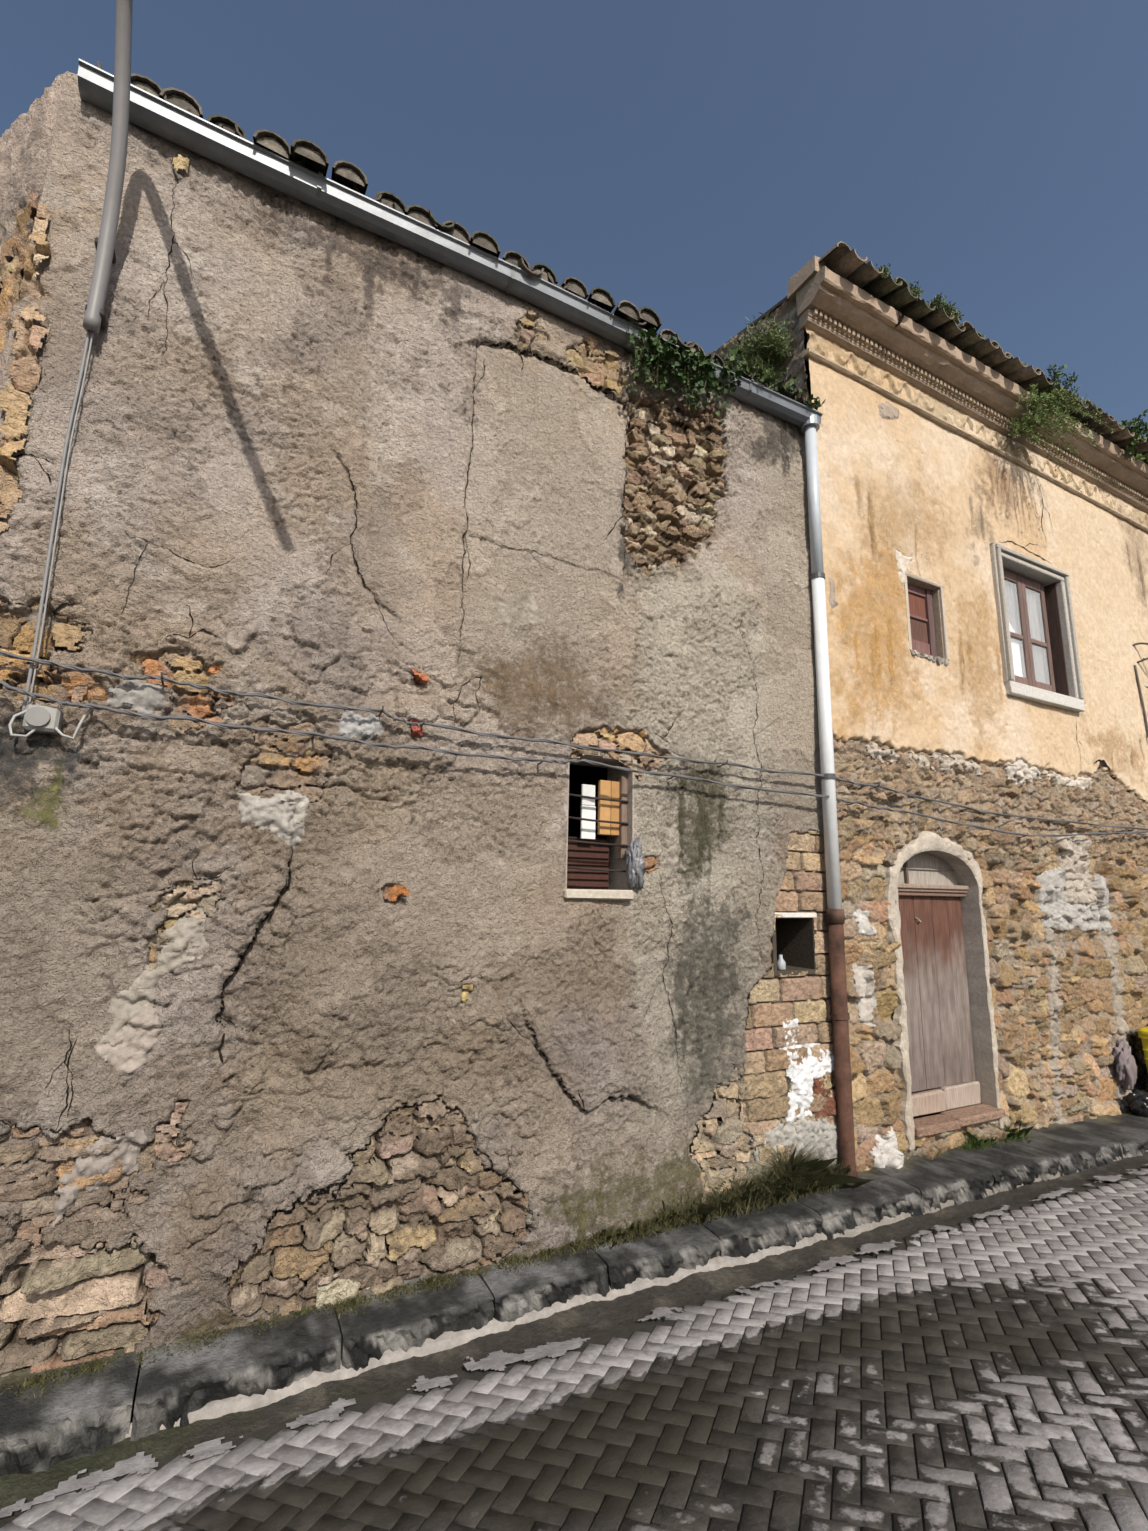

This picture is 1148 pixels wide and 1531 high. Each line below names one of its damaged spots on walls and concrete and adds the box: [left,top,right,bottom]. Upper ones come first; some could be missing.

flaking render [0,187,51,532]
crack [148,178,192,354]
crack [326,449,395,638]
crack [450,341,628,726]
flaking render [566,335,729,577]
damp [0,711,92,823]
crack [215,849,293,1064]
crack [509,1020,645,1112]
damp [663,756,750,1104]
flaking render [689,831,837,1202]
flaking render [0,1101,194,1377]
flaking render [228,1095,533,1318]